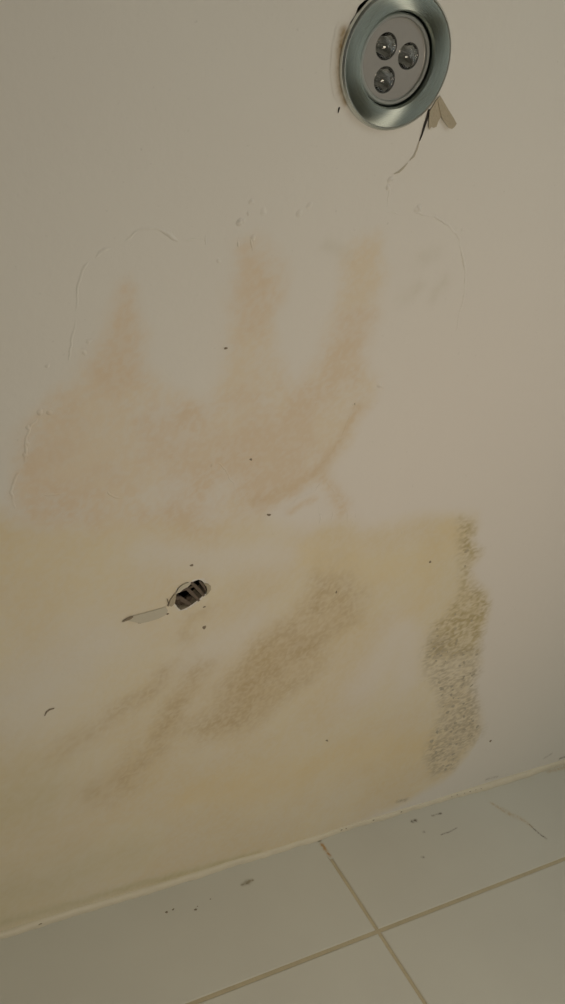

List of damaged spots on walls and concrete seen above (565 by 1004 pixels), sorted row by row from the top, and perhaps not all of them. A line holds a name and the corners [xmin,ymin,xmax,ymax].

crack [394,109,430,174]
spalling [122,580,211,623]
leakage [0,222,496,931]